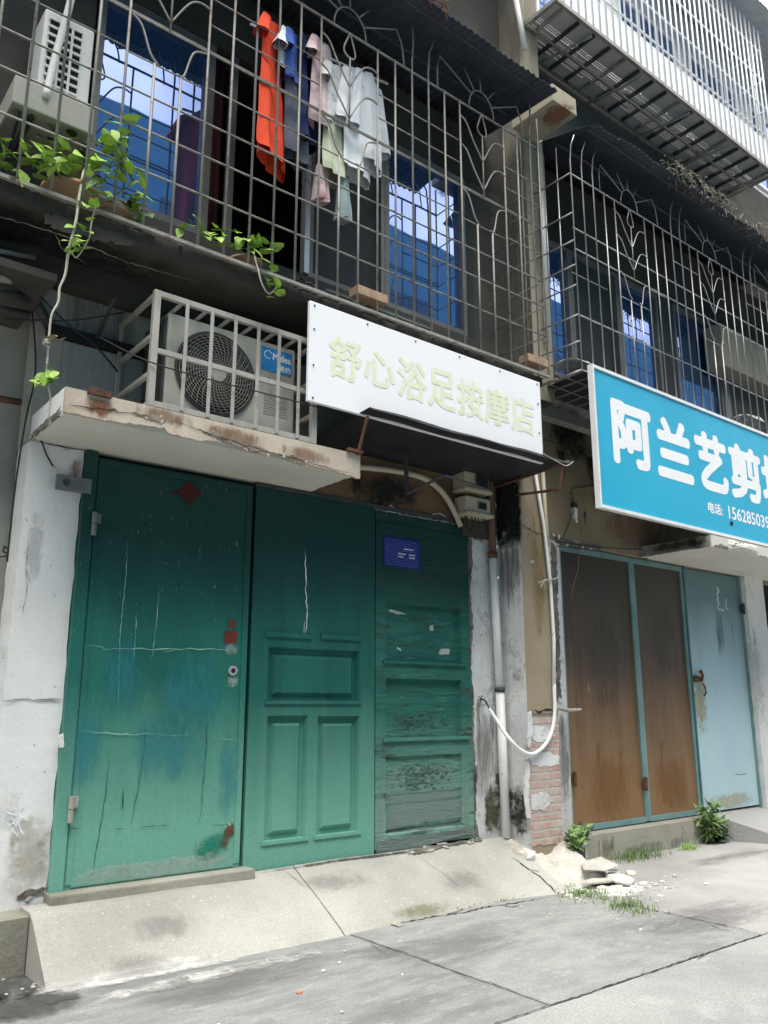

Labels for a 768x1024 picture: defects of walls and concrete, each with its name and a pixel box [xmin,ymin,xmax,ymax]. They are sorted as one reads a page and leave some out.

rust [543,104,573,125]
spalling [29,406,62,439]
rust [88,400,111,416]
crack [72,405,350,491]
damp [353,475,415,505]
spalling [523,533,601,846]
damp [478,702,527,834]